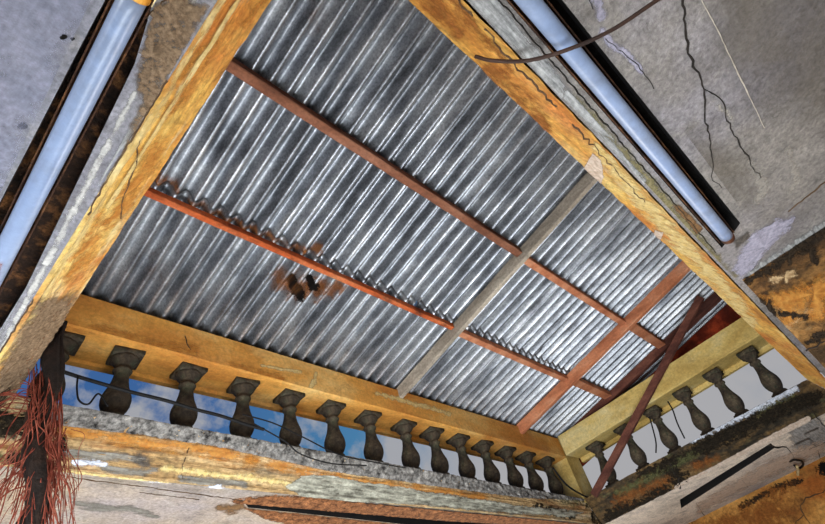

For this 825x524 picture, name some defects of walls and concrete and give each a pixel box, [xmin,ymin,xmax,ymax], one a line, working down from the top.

leakage [0,0,240,350]
corrosion [65,142,179,282]
crack [87,80,168,219]
corrosion [162,43,217,118]
crack [498,0,716,253]
leakage [468,0,825,328]
crack [681,0,761,188]
flaking render [732,217,795,276]
crack [0,299,34,353]
leakage [804,330,825,345]
spalling [52,403,584,524]
leakage [585,386,825,524]